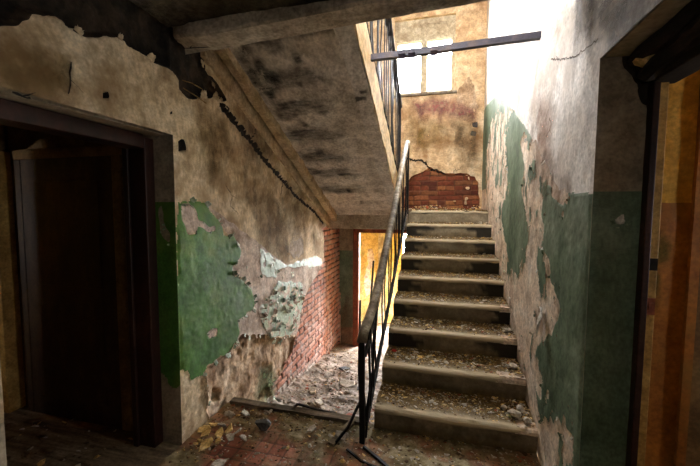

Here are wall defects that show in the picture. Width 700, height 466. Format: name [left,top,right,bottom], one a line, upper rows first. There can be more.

flaking render [0,0,227,102]
water stain [249,56,326,119]
crack [551,38,598,61]
crack [220,103,323,224]
crack [409,158,460,175]
flaking render [181,197,341,426]
peeling [401,104,574,466]